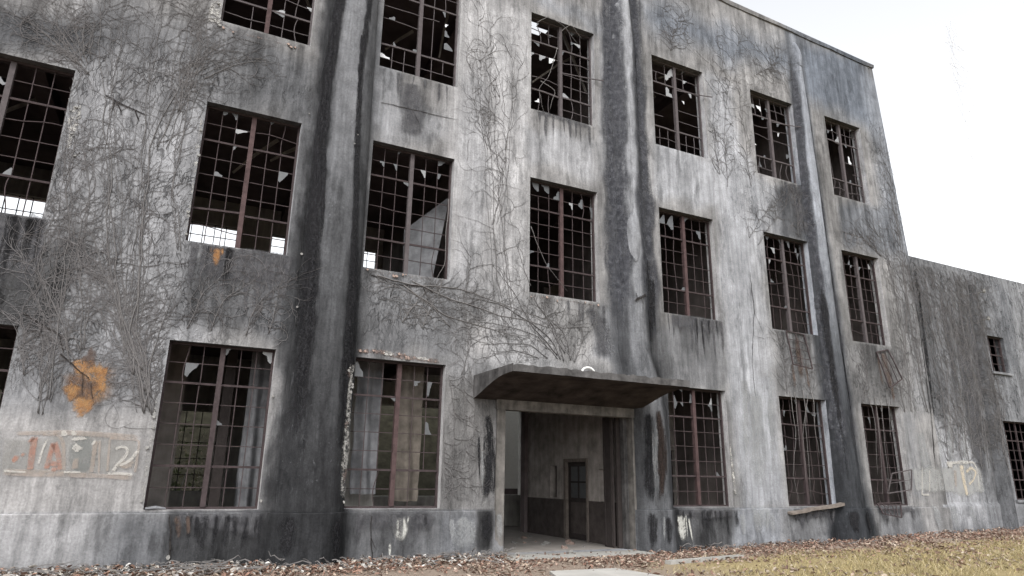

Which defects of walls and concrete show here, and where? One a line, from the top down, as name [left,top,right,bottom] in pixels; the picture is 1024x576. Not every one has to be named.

damp [188,0,346,447]
damp [337,0,372,453]
damp [567,0,724,356]
rust [65,349,107,416]
damp [175,509,262,549]
flaking render [341,365,354,503]
damp [477,415,496,498]
damp [642,414,775,546]